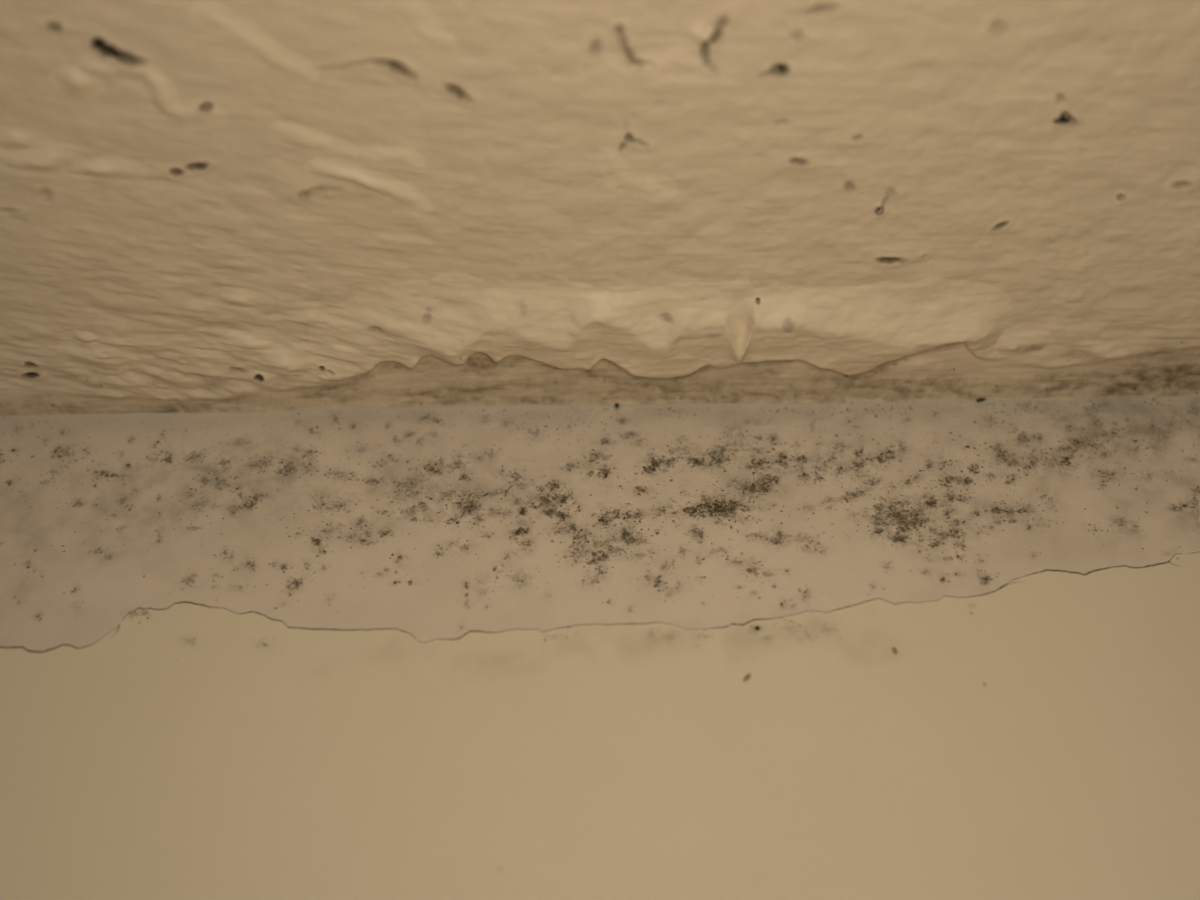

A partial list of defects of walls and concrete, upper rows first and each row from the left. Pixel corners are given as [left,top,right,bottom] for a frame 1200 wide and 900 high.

damp [509,484,657,574]
damp [644,445,736,473]
damp [664,438,805,522]
damp [875,465,982,542]